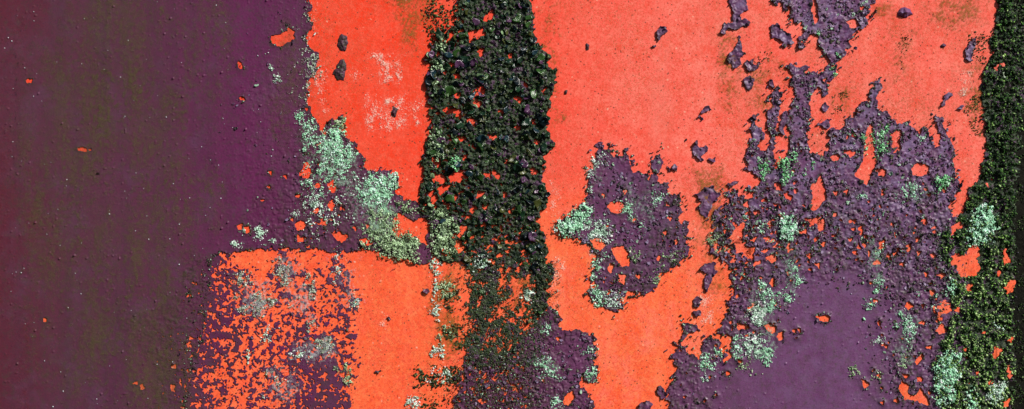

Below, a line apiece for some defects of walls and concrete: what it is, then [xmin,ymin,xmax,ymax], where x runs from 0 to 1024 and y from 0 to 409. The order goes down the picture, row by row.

peeling [0,0,555,409]
peeling [557,141,696,318]
peeling [660,0,972,409]